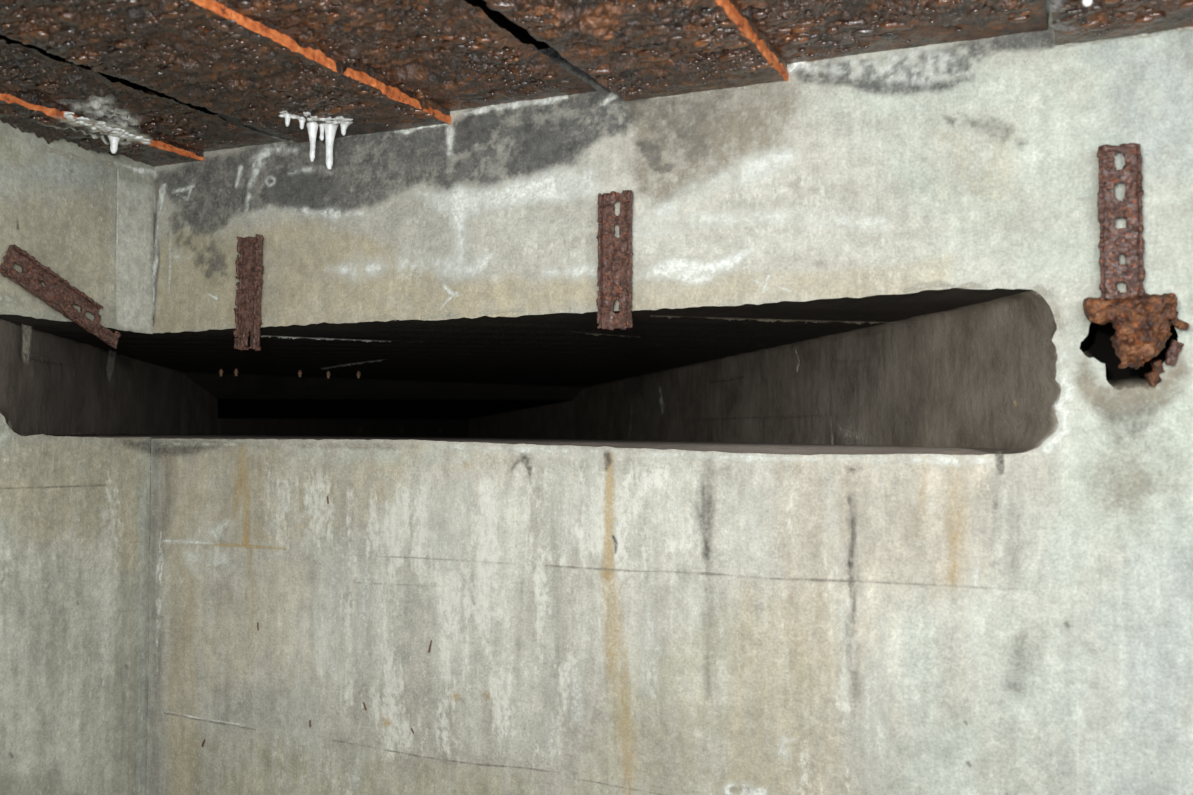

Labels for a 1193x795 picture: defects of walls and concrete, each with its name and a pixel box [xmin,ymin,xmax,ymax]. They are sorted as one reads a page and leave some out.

corrosion [0,0,451,161]
corrosion [396,33,530,72]
corrosion [486,0,571,37]
corrosion [594,0,911,81]
leakage [801,25,1067,93]
leakage [1051,0,1093,12]
corrosion [1051,0,1193,34]
leakage [38,96,151,154]
leakage [152,47,794,321]
spalling [1079,322,1178,390]
corrosion [1144,311,1190,386]
corrosion [604,452,613,574]